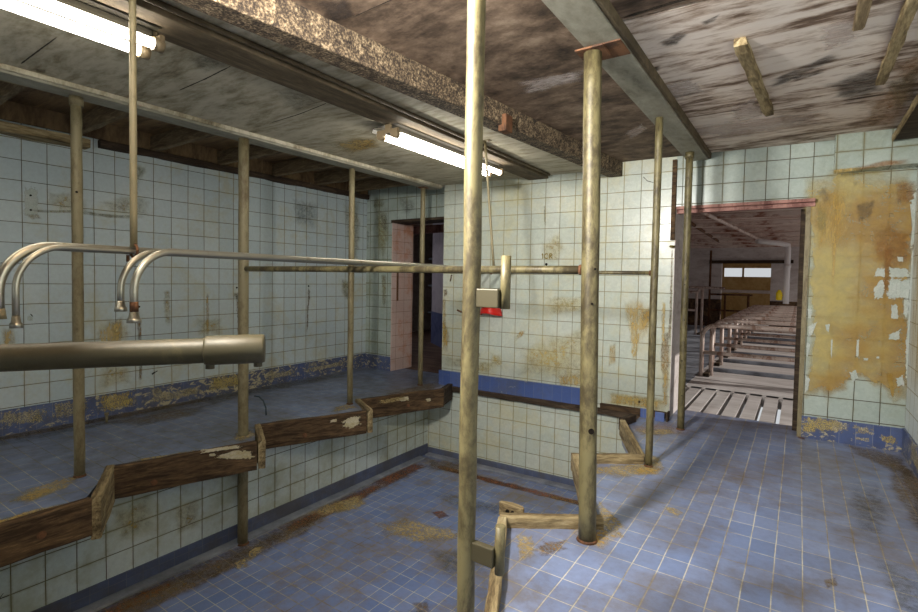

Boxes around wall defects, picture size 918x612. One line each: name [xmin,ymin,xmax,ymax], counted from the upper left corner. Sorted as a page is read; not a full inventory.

leakage [776,57,833,85]
leakage [836,71,878,98]
peeling [874,188,917,386]
peeling [806,308,833,357]
peeling [802,417,896,444]
spalling [477,458,575,486]
spalling [0,398,459,612]